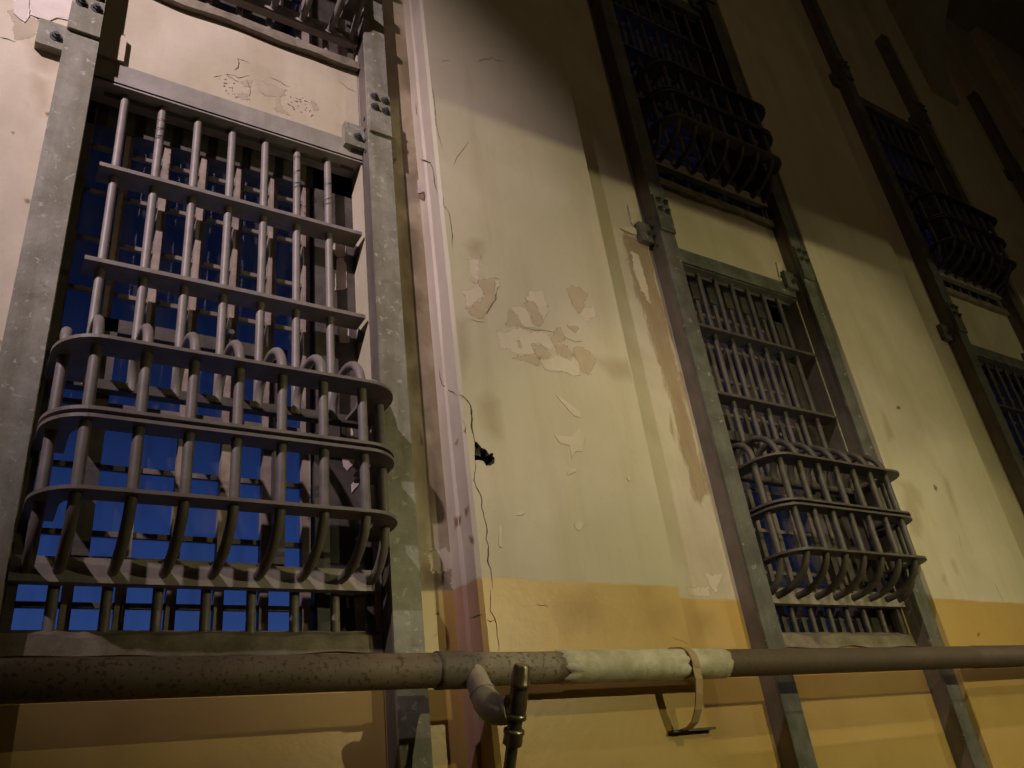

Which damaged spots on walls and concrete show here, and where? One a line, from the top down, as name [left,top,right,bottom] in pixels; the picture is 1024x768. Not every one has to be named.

peeling [7,0,72,40]
peeling [496,285,598,378]
crack [439,373,499,643]